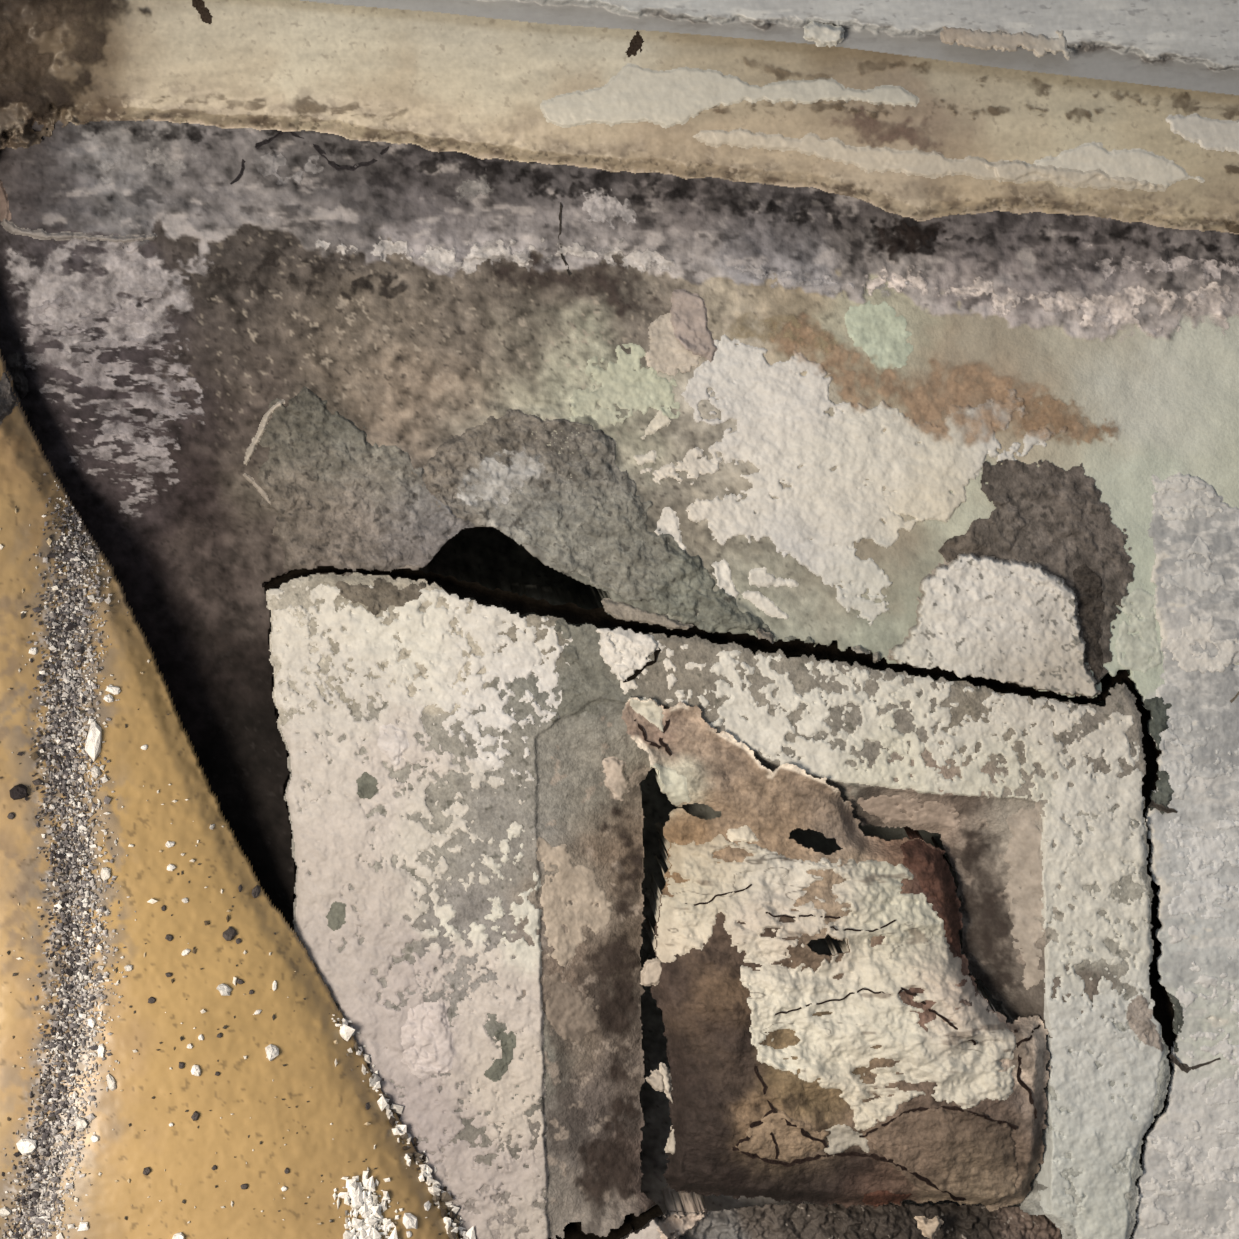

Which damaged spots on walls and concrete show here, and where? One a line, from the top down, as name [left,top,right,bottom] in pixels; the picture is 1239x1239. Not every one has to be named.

damp [142,123,217,177]
damp [258,134,354,184]
damp [457,158,501,198]
damp [289,170,692,316]
peeling [540,26,1205,192]
damp [734,218,1239,338]
peeling [1166,113,1239,154]
damp [6,238,276,517]
peeling [243,289,1239,1239]
crack [263,566,1221,1239]
damp [587,936,640,1083]
damp [576,1098,639,1202]